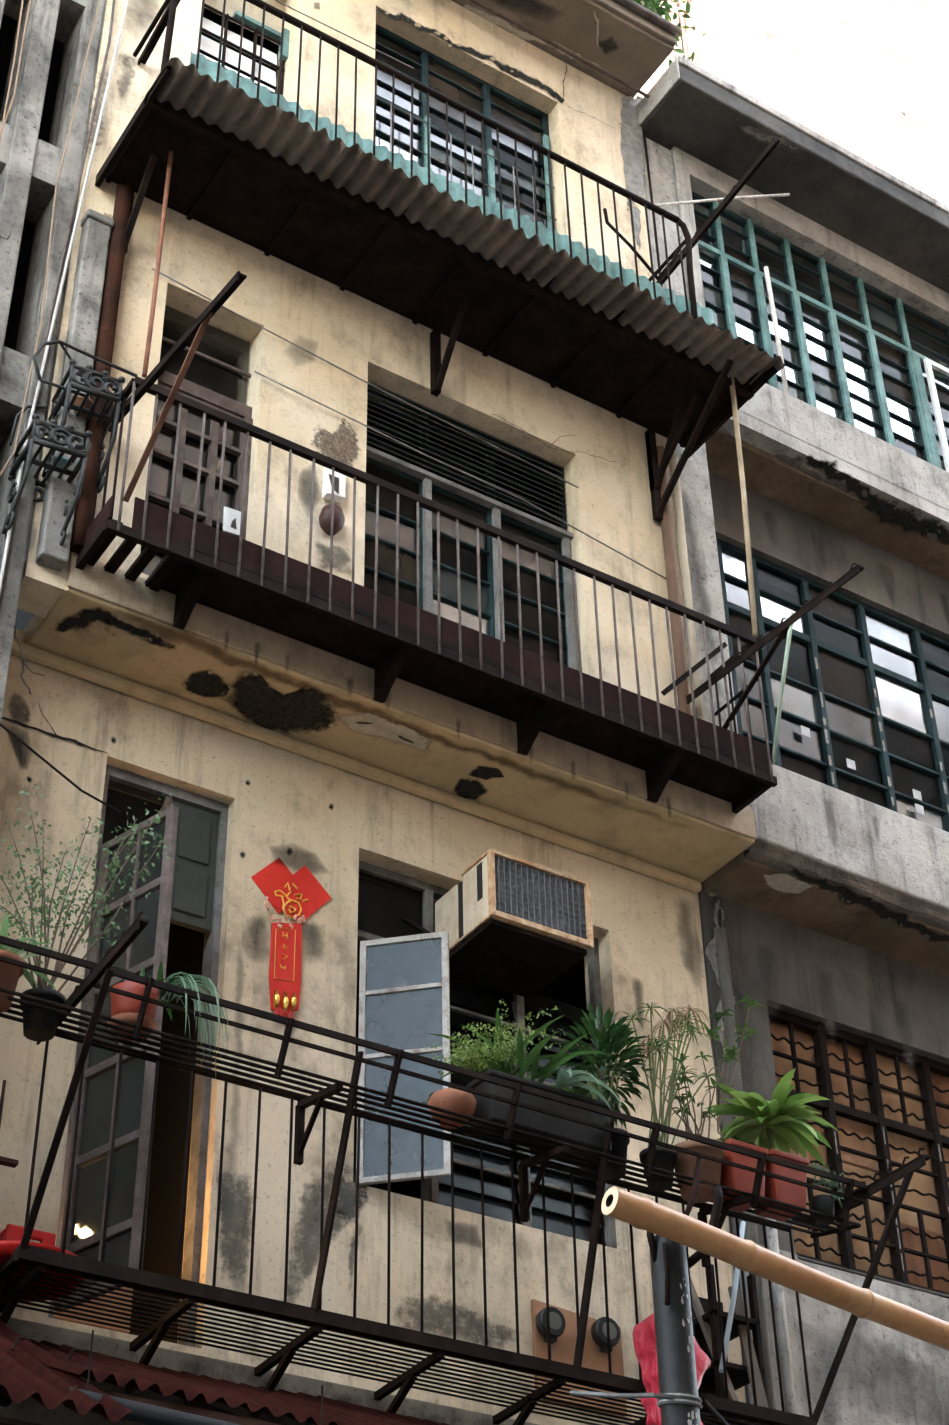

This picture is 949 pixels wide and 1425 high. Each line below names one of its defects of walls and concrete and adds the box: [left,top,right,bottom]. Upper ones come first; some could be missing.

flaking render [378,8,565,103]
water stain [131,615,617,803]
water stain [218,1173,253,1279]
water stain [288,1168,367,1301]